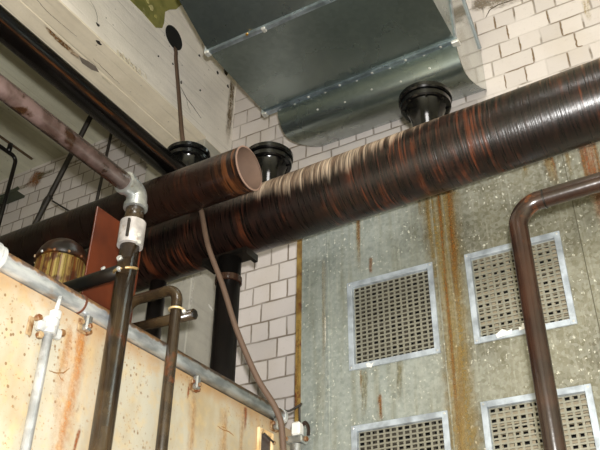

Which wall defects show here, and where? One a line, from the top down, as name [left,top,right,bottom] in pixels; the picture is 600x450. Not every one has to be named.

peeling [130,0,182,28]
corrosion [579,143,600,176]
corrosion [418,191,478,450]